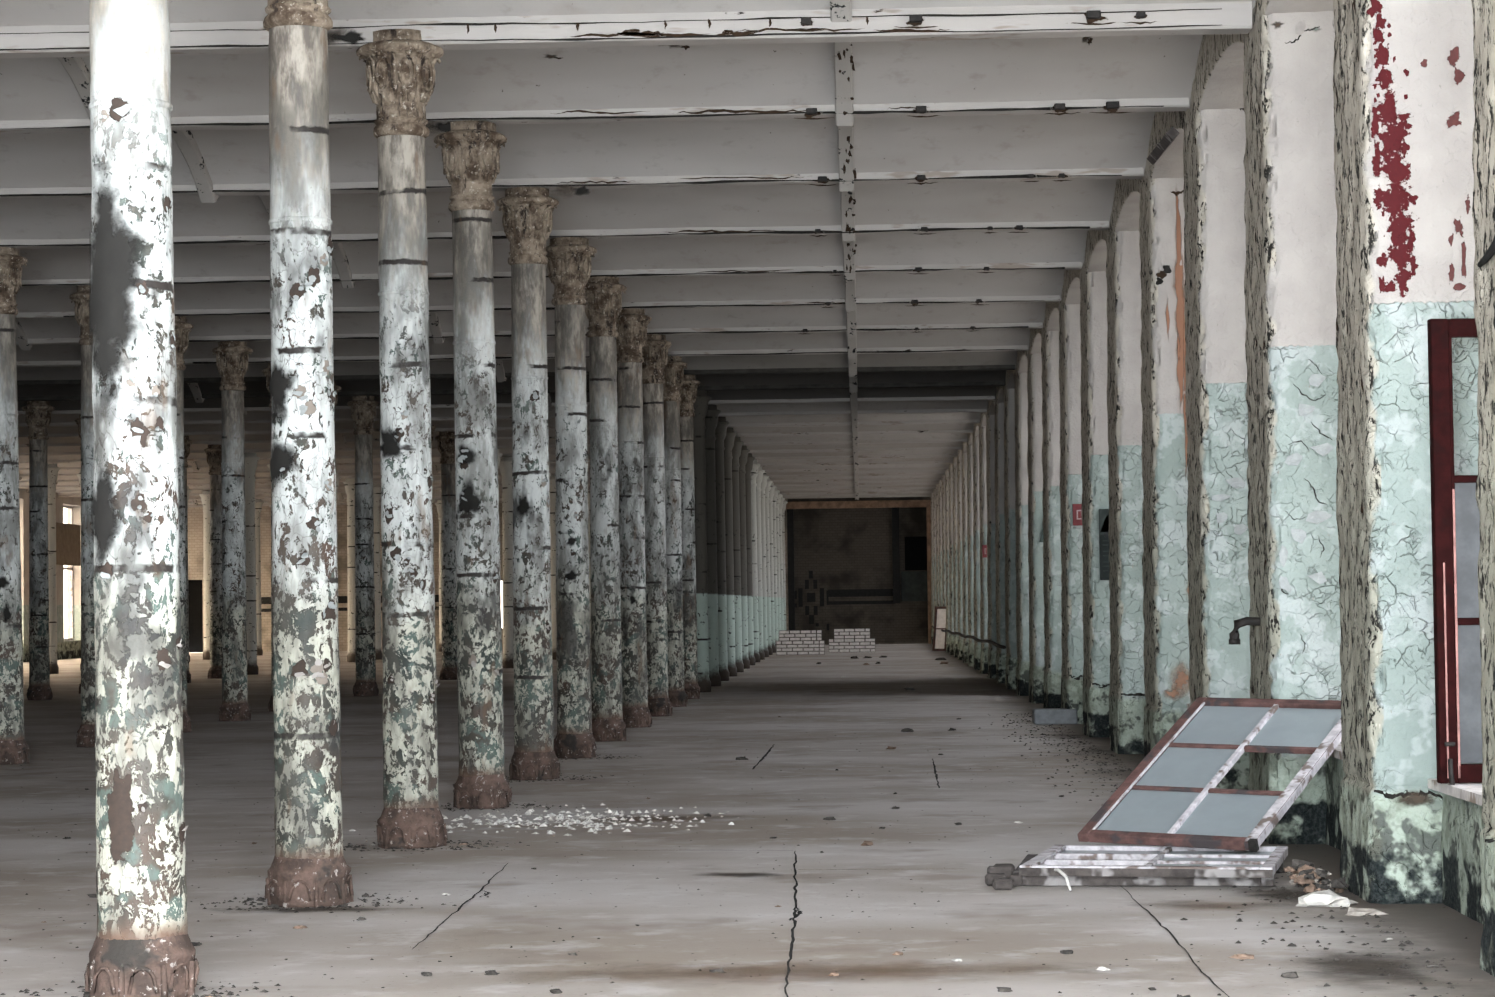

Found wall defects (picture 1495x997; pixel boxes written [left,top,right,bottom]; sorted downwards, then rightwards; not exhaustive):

peeling [98,97,131,123]
peeling [1352,0,1419,298]
peeling [289,236,333,301]
peeling [292,360,337,416]
peeling [130,416,164,448]
peeling [131,493,155,523]
peeling [306,516,321,532]
peeling [321,599,336,621]
peeling [156,636,182,670]
peeling [291,658,332,685]
crack [784,852,853,997]
crack [1121,886,1229,997]